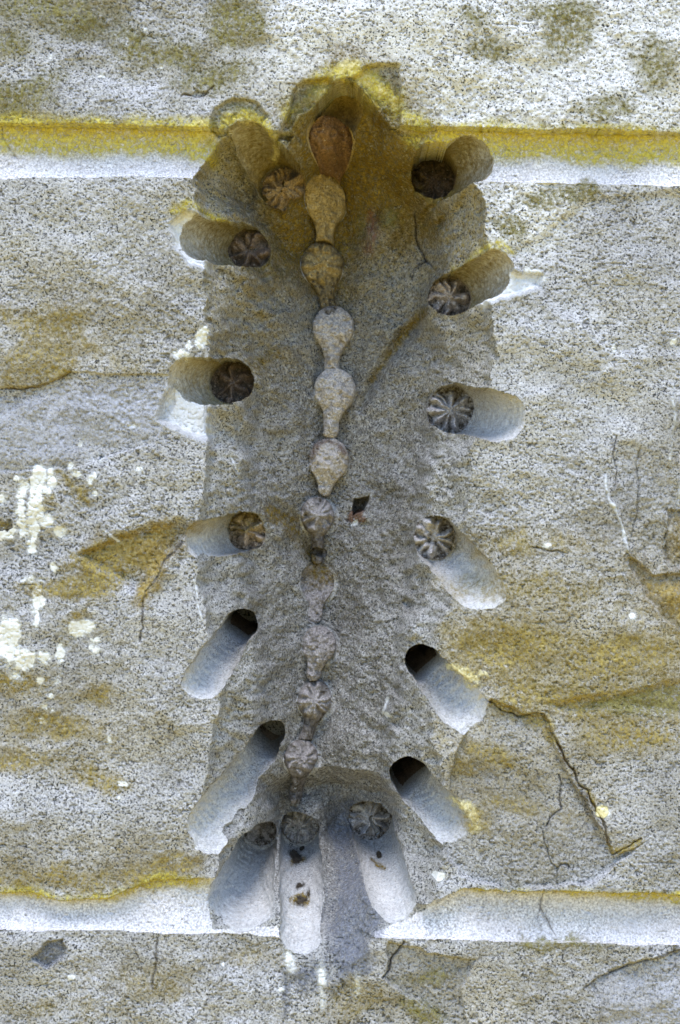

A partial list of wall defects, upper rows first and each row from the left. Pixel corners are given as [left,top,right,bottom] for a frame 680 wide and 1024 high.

leakage [0,531,134,741]
leakage [78,766,128,800]
crack [544,715,641,846]
leakage [0,861,108,894]